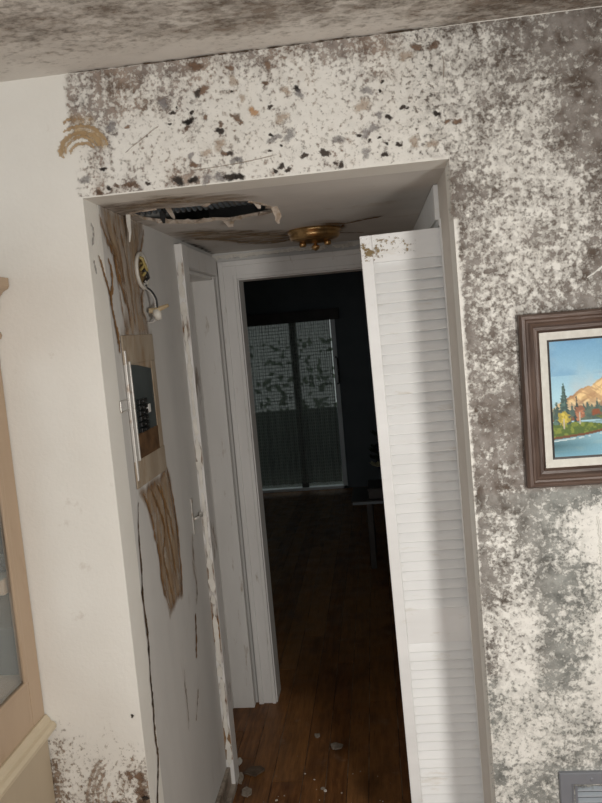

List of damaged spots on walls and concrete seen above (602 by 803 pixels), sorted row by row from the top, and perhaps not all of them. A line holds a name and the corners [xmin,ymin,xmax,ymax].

leakage [155,0,337,37]
leakage [193,80,209,102]
leakage [250,78,308,177]
leakage [354,104,392,142]
leakage [163,113,246,187]
leakage [317,136,371,170]
spalling [126,208,213,242]
spalling [248,201,282,224]
leakage [360,237,408,261]
leakage [92,197,209,352]
leakage [141,469,183,610]
leakage [49,739,150,803]